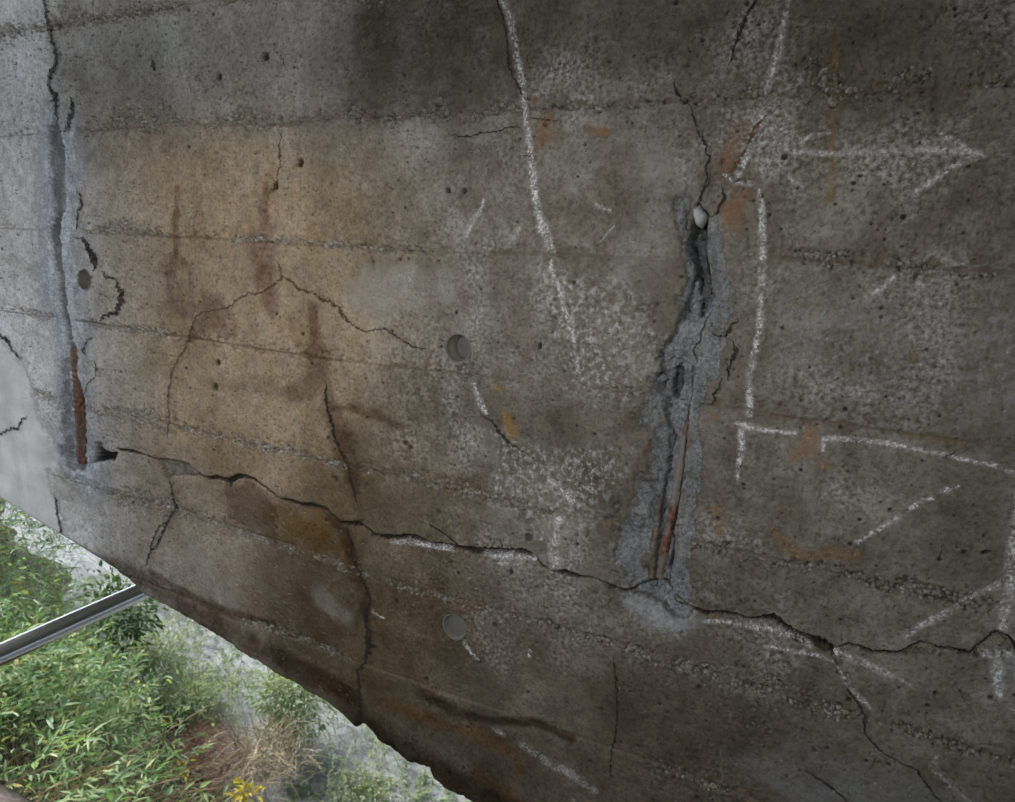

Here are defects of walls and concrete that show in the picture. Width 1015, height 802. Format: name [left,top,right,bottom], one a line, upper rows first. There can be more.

crack [42,0,75,132]
crack [268,131,282,194]
crack [120,261,431,566]
spalling [612,195,734,618]
crack [199,381,943,802]